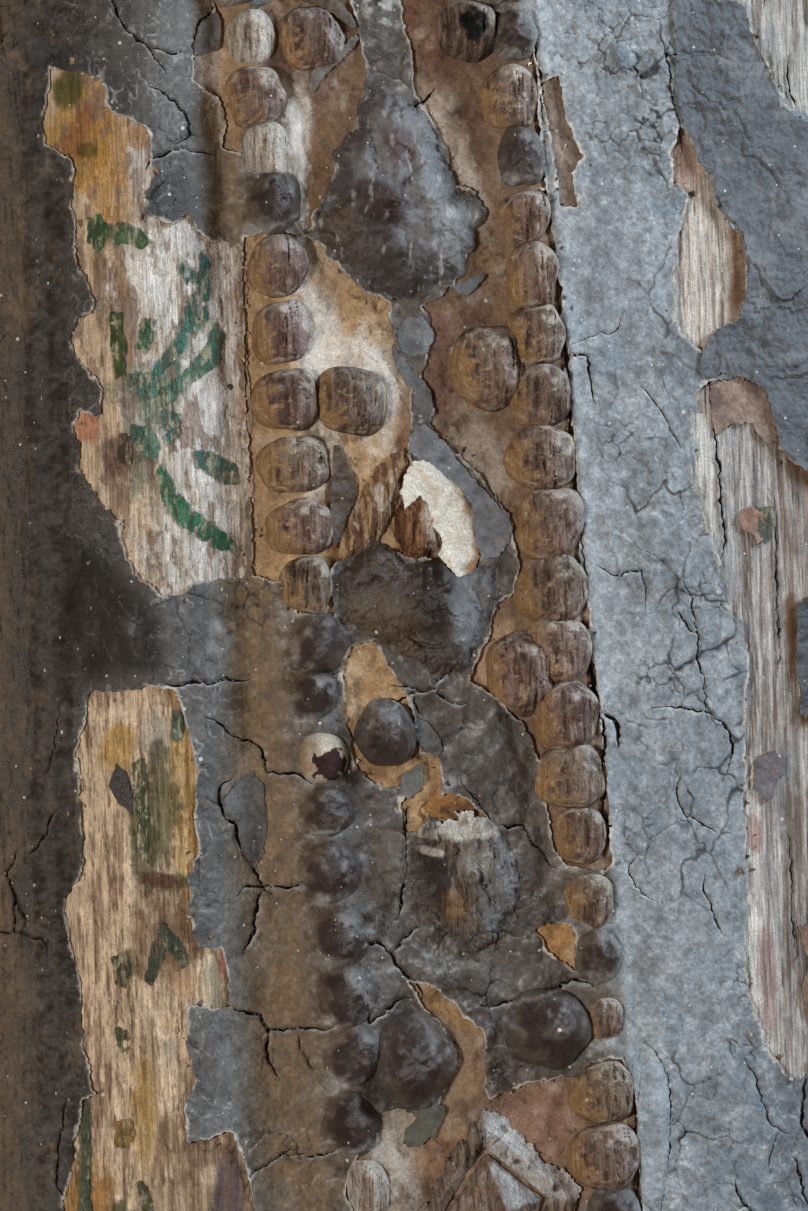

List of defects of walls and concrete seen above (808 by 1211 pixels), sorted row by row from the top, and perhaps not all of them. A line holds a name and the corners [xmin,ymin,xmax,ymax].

peeling [63,686,254,1211]
crack [217,779,299,954]
peeling [42,0,583,597]
peeling [342,640,485,894]
peeling [547,662,612,871]
peeling [574,602,589,629]
crack [556,288,624,491]
crack [589,663,621,823]
crack [650,582,734,782]
crack [708,379,727,559]
peeling [670,0,808,1124]
crack [747,1064,808,1204]